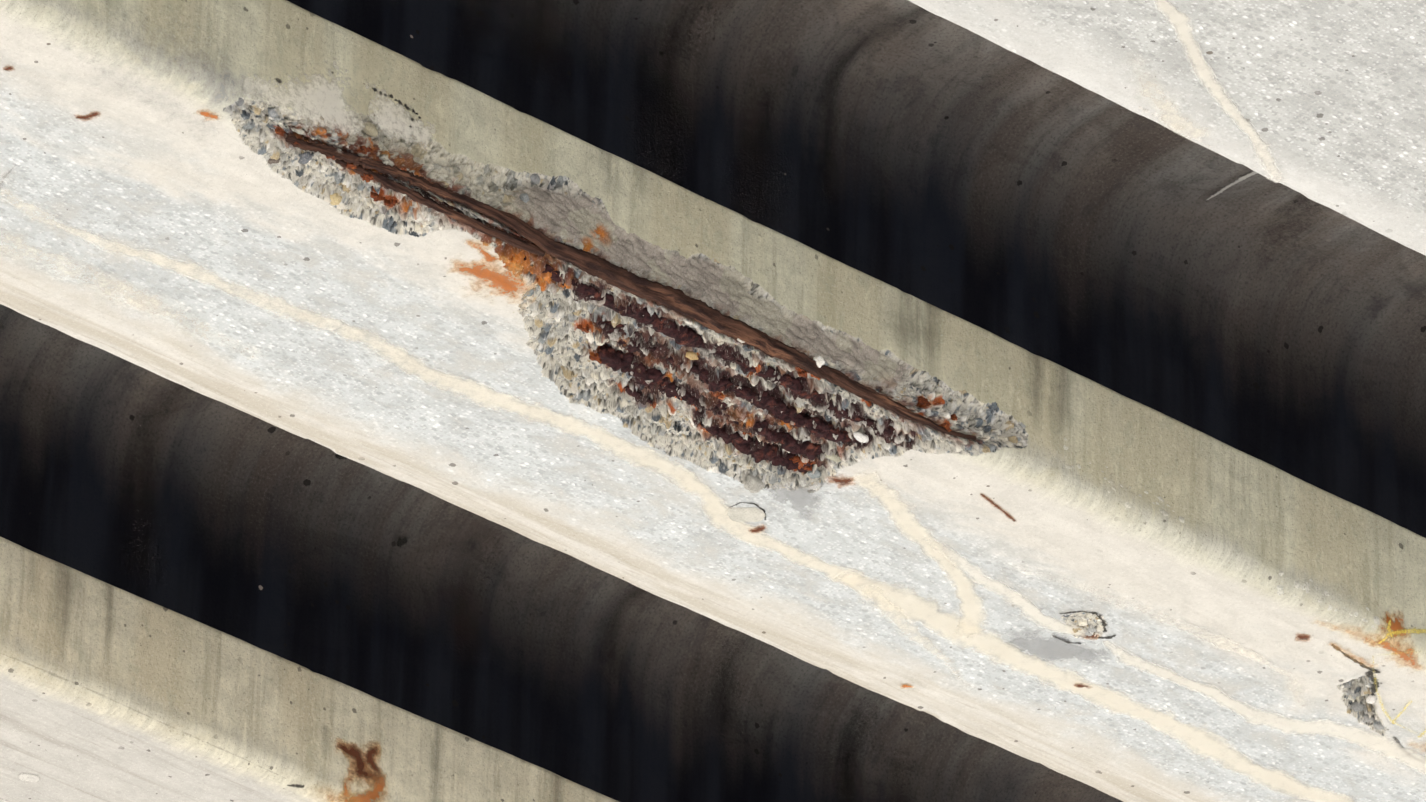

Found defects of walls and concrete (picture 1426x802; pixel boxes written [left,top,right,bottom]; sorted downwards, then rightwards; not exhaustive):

spalling [216,63,1035,498]
crack [728,502,766,520]
crack [980,494,1016,522]
spalling [1053,606,1116,644]
rust [1365,613,1420,668]
spalling [1329,644,1396,738]
rust [331,742,386,802]